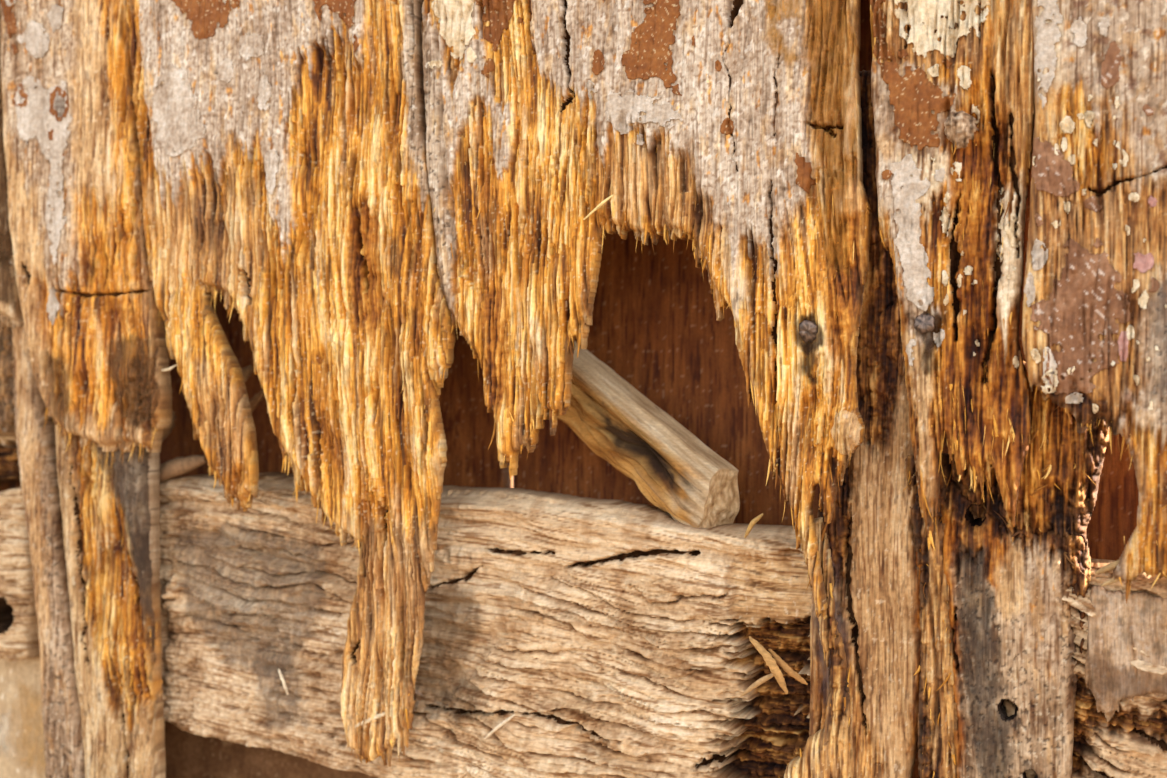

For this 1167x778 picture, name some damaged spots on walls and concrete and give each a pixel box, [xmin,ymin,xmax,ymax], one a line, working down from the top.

peeling [171,0,240,40]
peeling [313,0,359,53]
peeling [428,0,524,78]
peeling [587,0,683,145]
peeling [1034,0,1122,121]
peeling [264,149,280,195]
peeling [870,0,990,311]
crack [1088,166,1167,196]
crack [22,265,31,286]
crack [59,289,148,298]
peeling [994,94,1160,414]
crack [432,548,701,588]